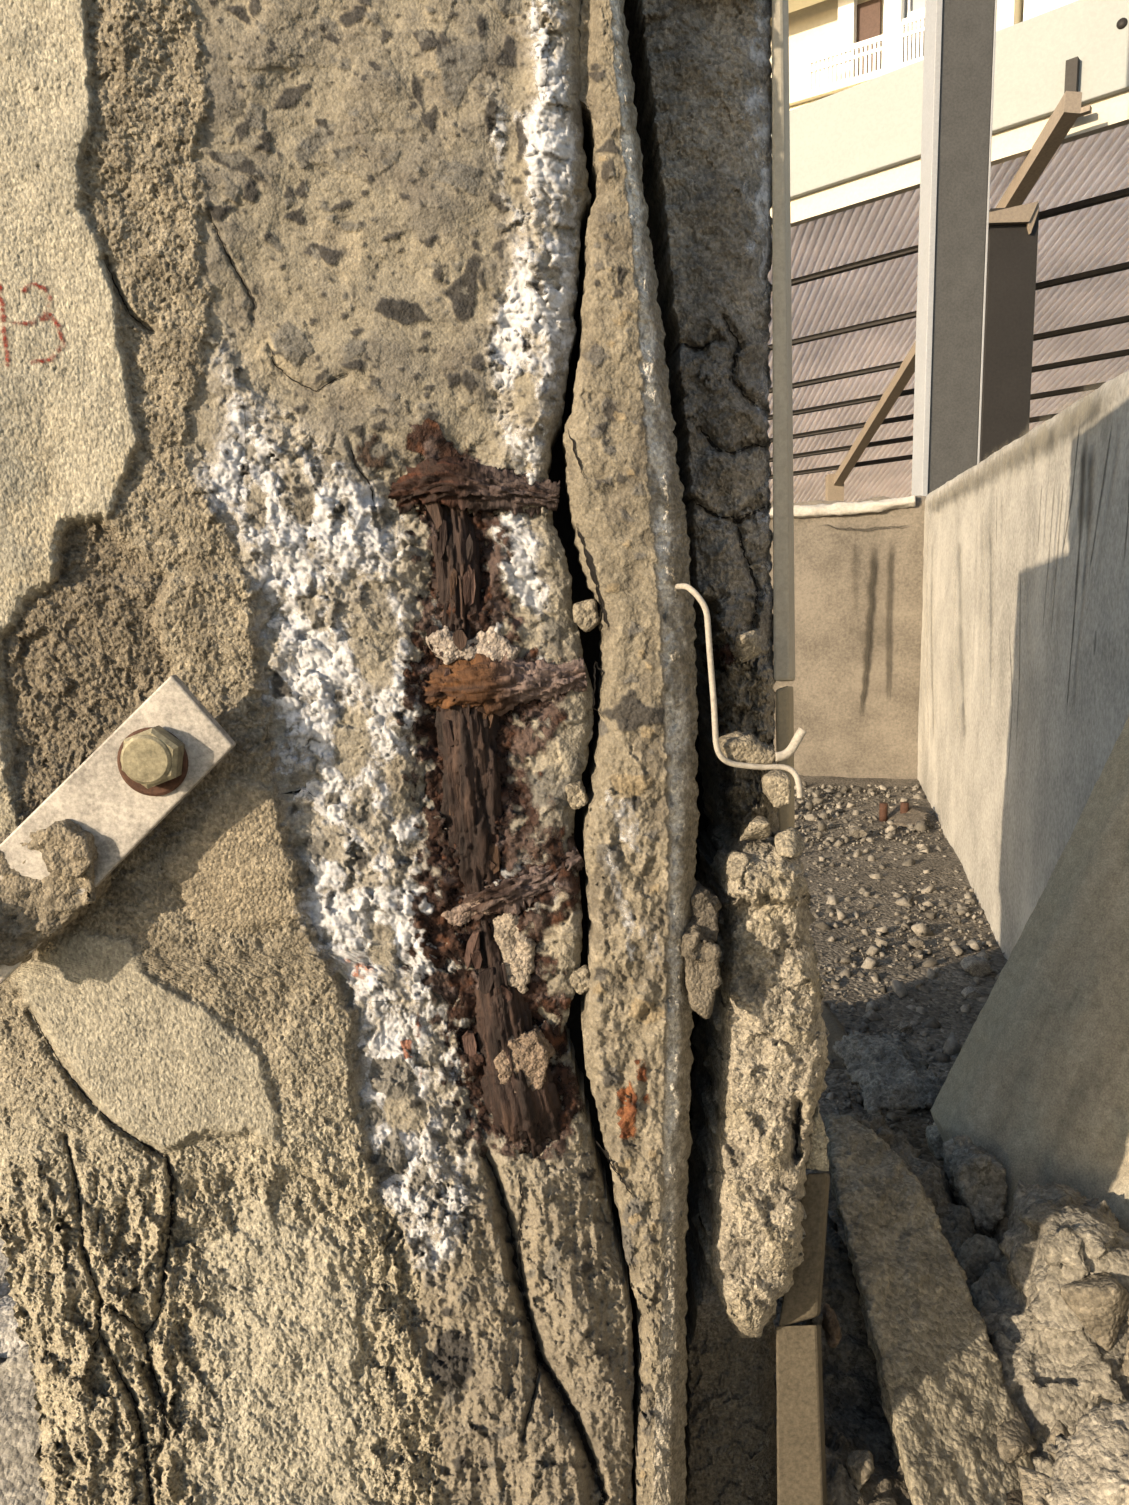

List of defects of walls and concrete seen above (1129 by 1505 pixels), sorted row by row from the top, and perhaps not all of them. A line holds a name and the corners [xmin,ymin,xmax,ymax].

crack [32,1014,174,1505]
spalling [0,0,635,1505]
water stain [202,358,468,1272]
corrosion [406,418,479,468]
corrosion [397,498,588,1160]
water stain [493,861,529,886]
water stain [491,512,549,614]
water stain [489,0,581,486]
crack [486,1156,633,1505]
crack [548,139,636,1355]
corrosion [616,1060,648,1139]
crack [791,1102,801,1155]